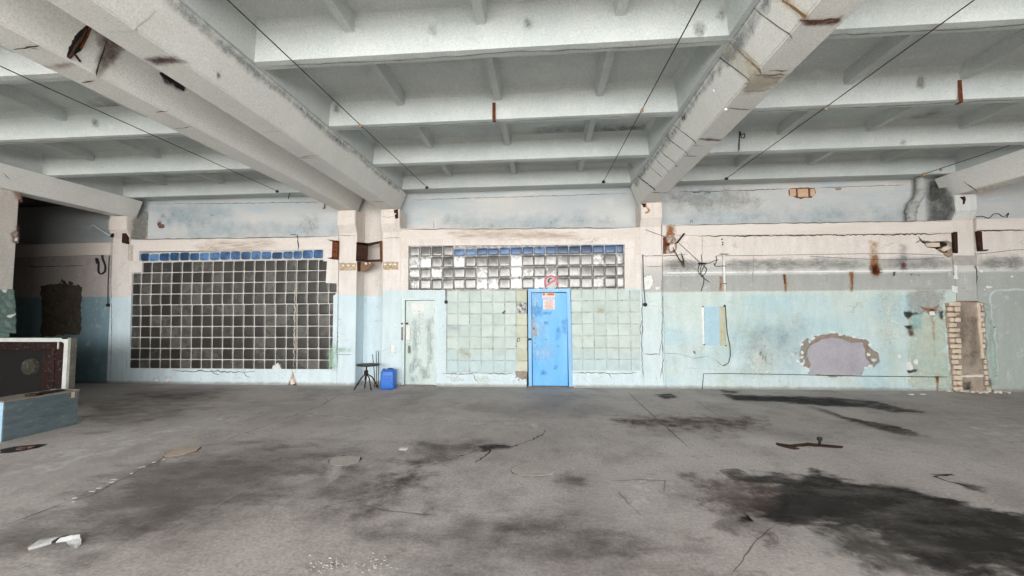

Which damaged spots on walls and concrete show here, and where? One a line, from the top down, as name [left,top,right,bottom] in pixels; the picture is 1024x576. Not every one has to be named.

flaking render [788,187,816,199]
damp [927,184,953,221]
spalling [909,241,992,391]
spalling [789,331,880,377]